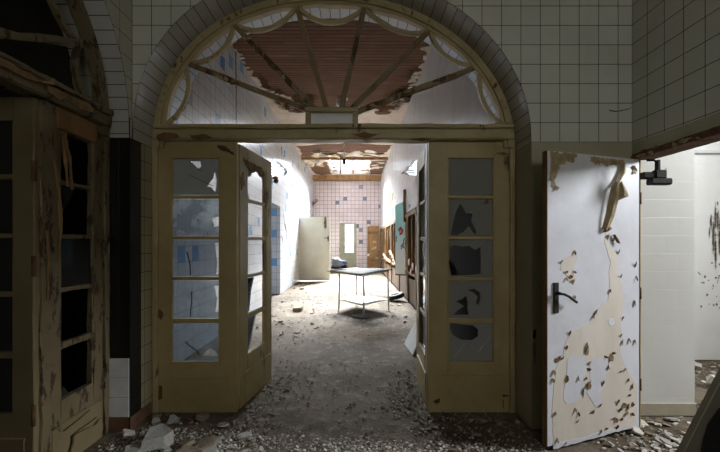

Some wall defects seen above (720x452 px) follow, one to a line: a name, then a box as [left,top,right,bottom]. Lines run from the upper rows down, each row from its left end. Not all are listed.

flaking render [230,19,431,115]
flaking render [297,132,391,175]
leakage [709,202,720,267]
peeling [551,208,637,449]